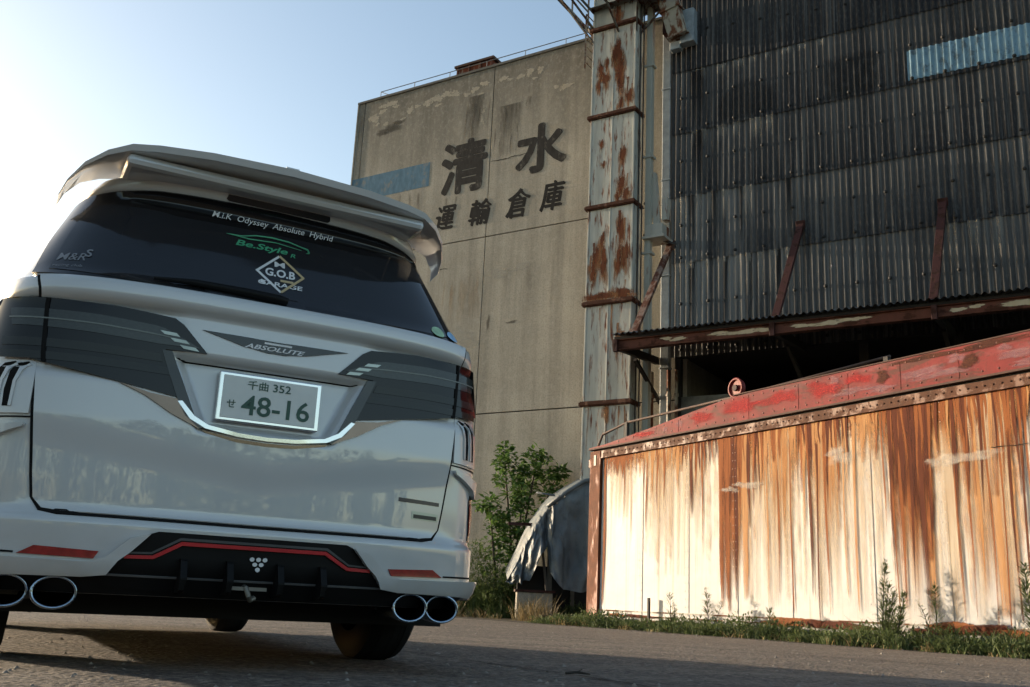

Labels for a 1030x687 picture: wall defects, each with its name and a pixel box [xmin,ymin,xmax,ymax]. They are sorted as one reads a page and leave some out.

peeling [368,66,544,126]
corrosion [596,38,634,110]
corrosion [584,139,635,370]
peeling [708,328,769,336]
peeling [791,316,871,328]
corrosion [602,385,1030,639]